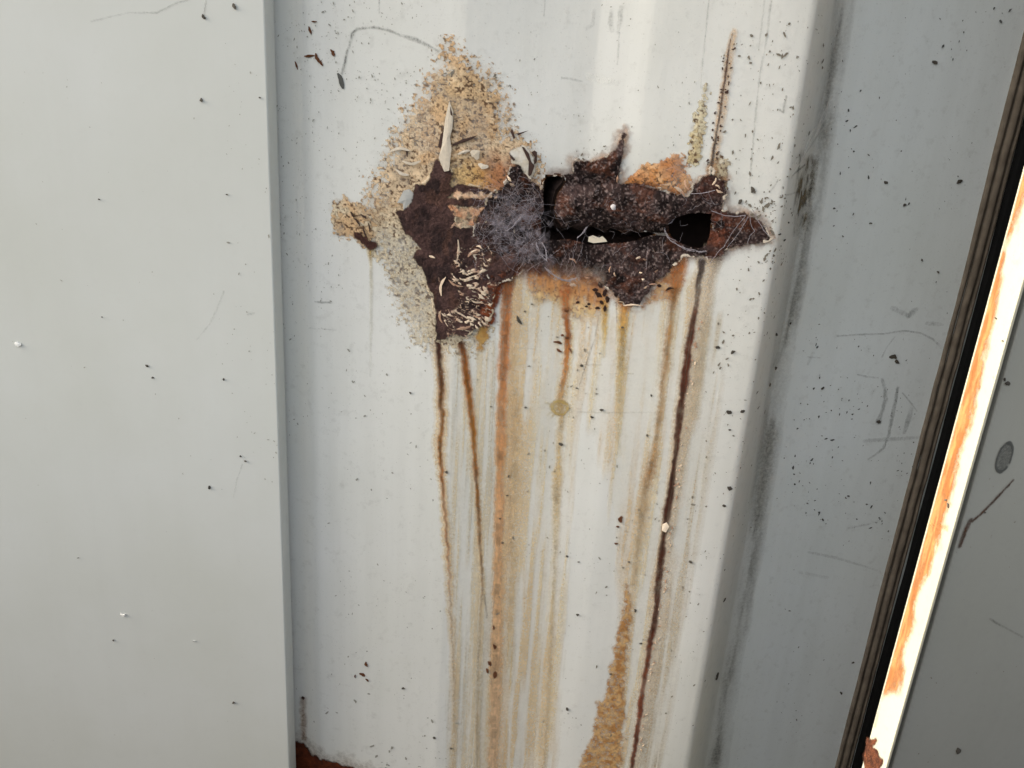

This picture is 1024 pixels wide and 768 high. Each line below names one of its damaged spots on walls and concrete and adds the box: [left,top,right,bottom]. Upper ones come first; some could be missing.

peeling [510,129,537,177]
corrosion [1007,174,1024,237]
corrosion [394,133,774,768]
corrosion [884,252,1005,694]
corrosion [863,738,883,768]